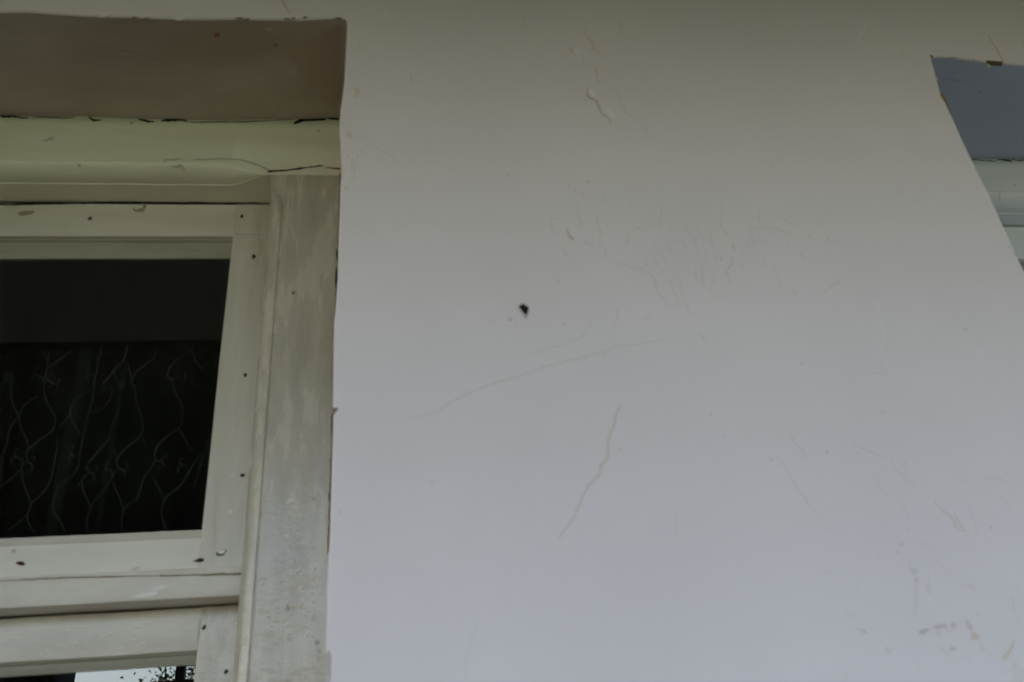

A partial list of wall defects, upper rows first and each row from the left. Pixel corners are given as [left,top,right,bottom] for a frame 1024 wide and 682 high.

crack [558,406,622,539]